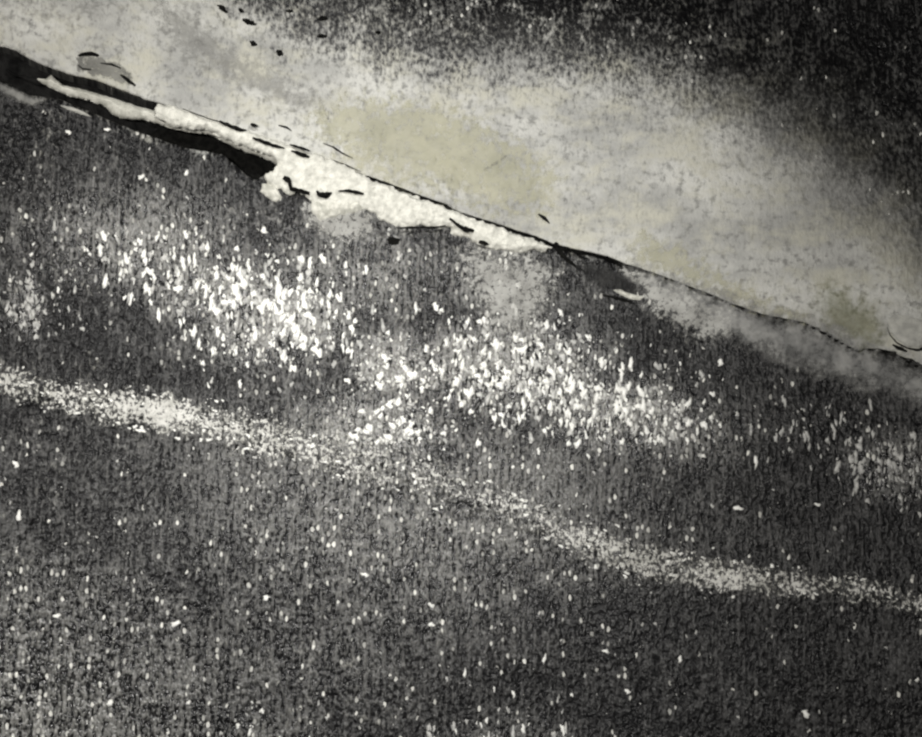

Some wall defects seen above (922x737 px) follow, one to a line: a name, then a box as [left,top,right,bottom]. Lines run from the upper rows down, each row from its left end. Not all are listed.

spalling [76,51,136,86]
spalling [154,103,552,253]
crack [182,108,922,372]